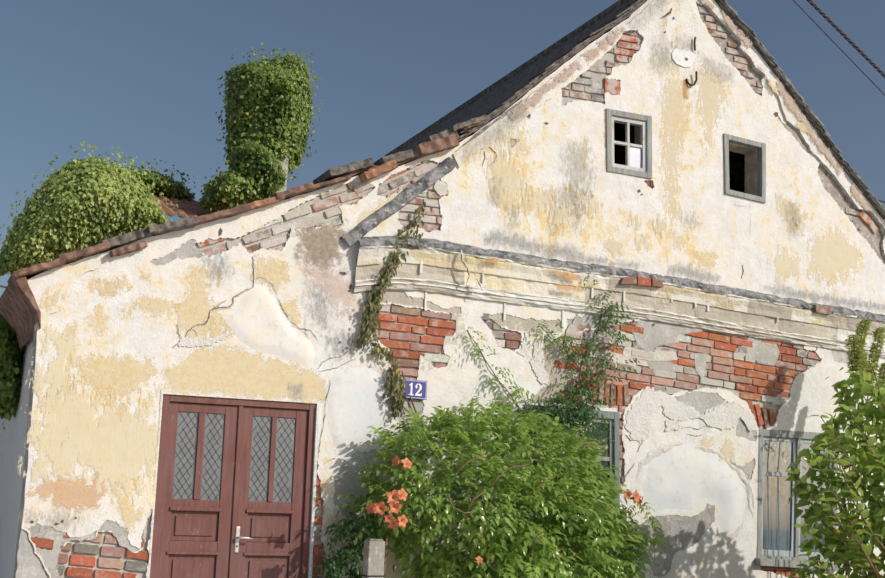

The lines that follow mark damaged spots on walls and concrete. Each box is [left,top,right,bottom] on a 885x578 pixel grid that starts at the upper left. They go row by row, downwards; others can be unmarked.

spalling [561,31,642,105]
spalling [696,0,779,96]
crack [173,256,318,348]
damp [295,224,360,315]
spalling [398,179,448,232]
peeling [767,164,885,289]
peeling [19,158,440,578]
crack [318,350,372,457]
spalling [364,290,466,427]
spalling [481,313,821,487]
peeling [385,538,452,578]
peeling [638,504,715,577]